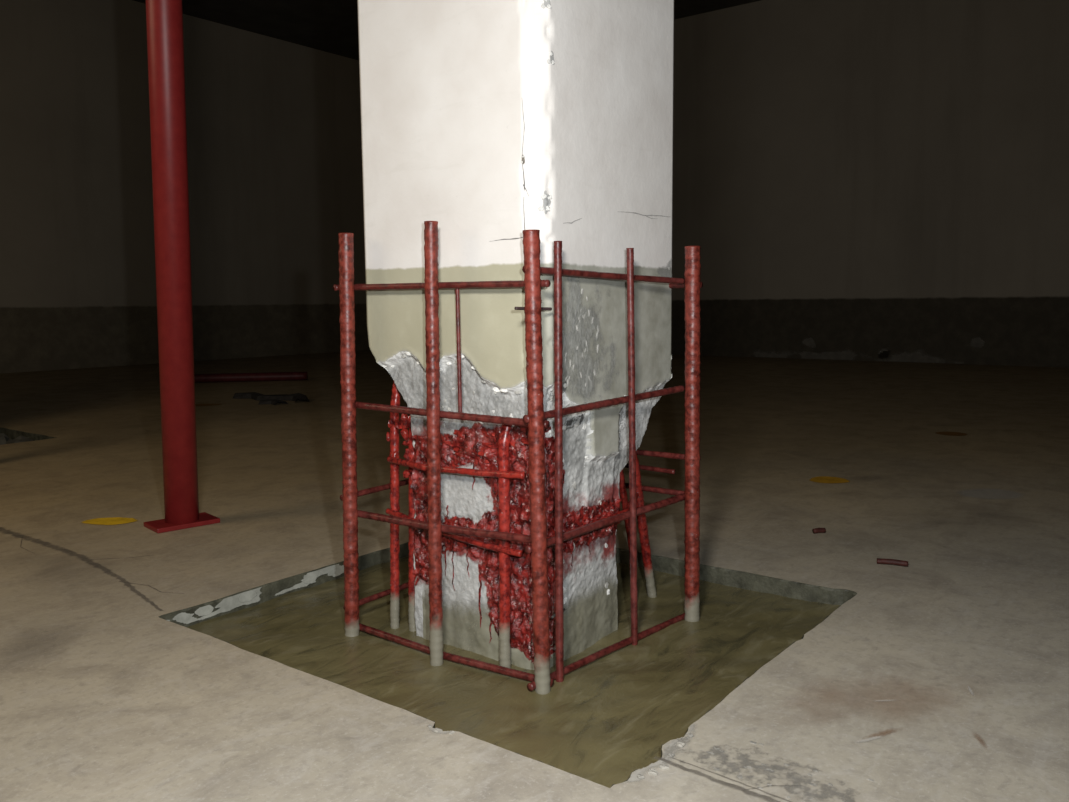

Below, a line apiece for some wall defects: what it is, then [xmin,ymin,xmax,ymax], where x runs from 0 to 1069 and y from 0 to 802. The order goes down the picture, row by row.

crack [0,527,161,610]
rust [386,414,429,586]
spalling [378,351,528,669]
rust [440,422,534,663]
rust [544,420,622,658]
spalling [543,276,669,611]